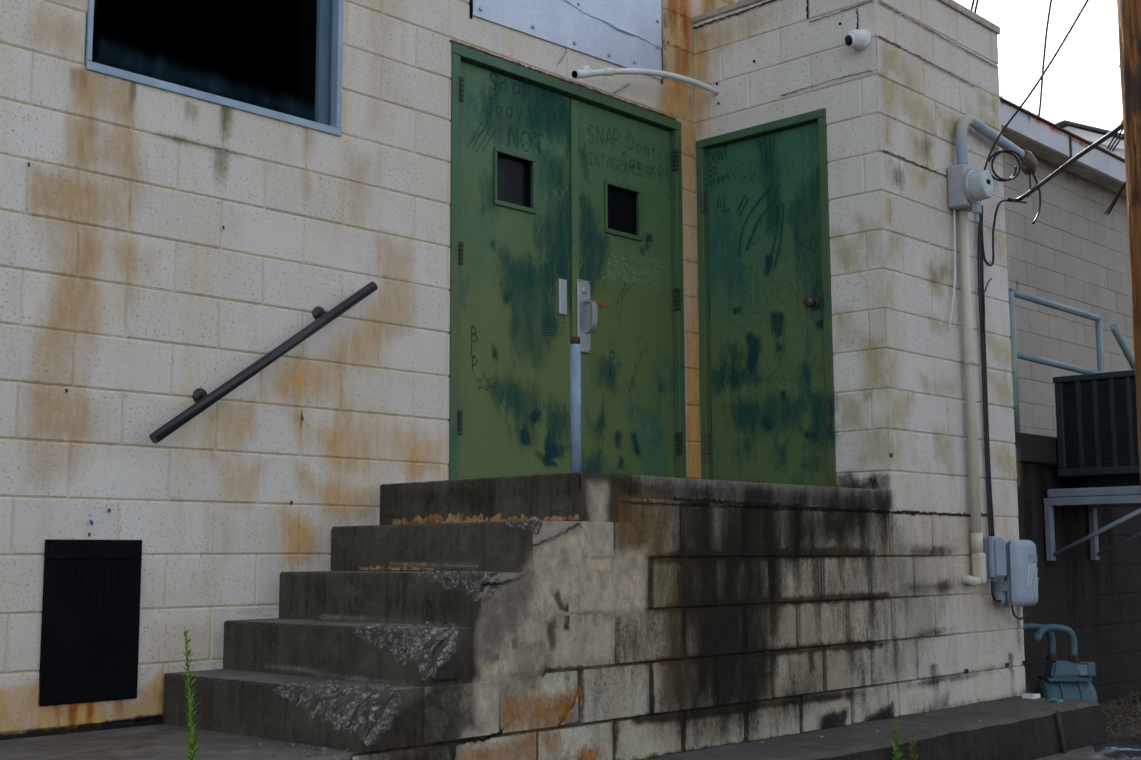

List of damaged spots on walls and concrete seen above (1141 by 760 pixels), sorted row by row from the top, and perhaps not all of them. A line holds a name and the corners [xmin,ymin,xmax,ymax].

damp [475,290,898,760]
damp [914,546,951,555]
spalling [359,565,501,602]
spalling [353,624,458,681]
damp [916,630,960,685]
spalling [273,681,401,746]